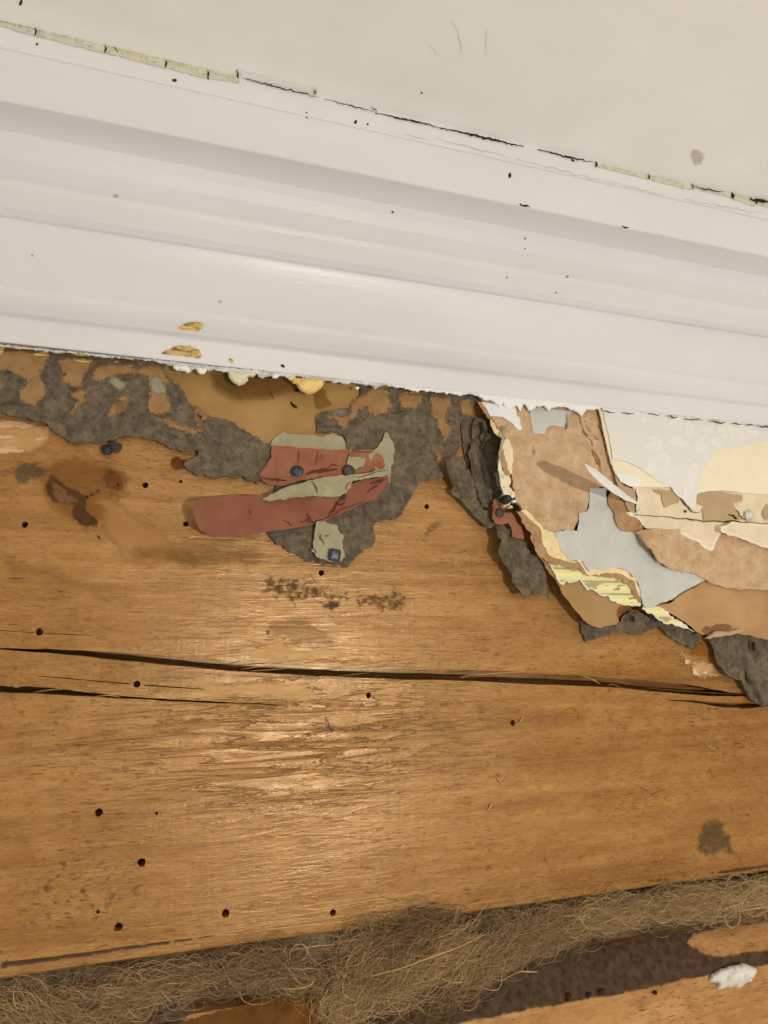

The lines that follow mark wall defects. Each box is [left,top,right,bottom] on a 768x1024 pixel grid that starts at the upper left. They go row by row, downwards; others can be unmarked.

crack [236,70,760,213]
peeling [0,344,601,466]
crack [0,630,768,709]